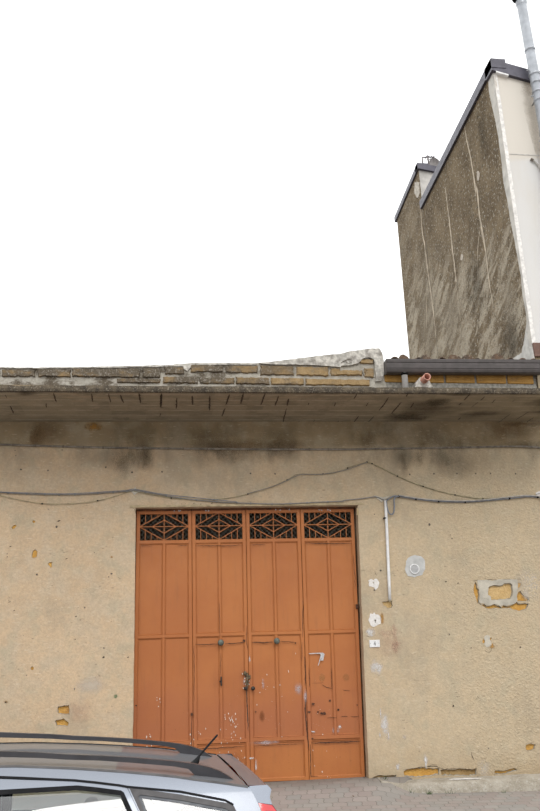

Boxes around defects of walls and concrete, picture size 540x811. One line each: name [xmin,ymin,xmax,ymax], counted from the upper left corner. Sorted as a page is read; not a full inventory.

spalling [473,582,529,611]
spalling [373,767,476,778]